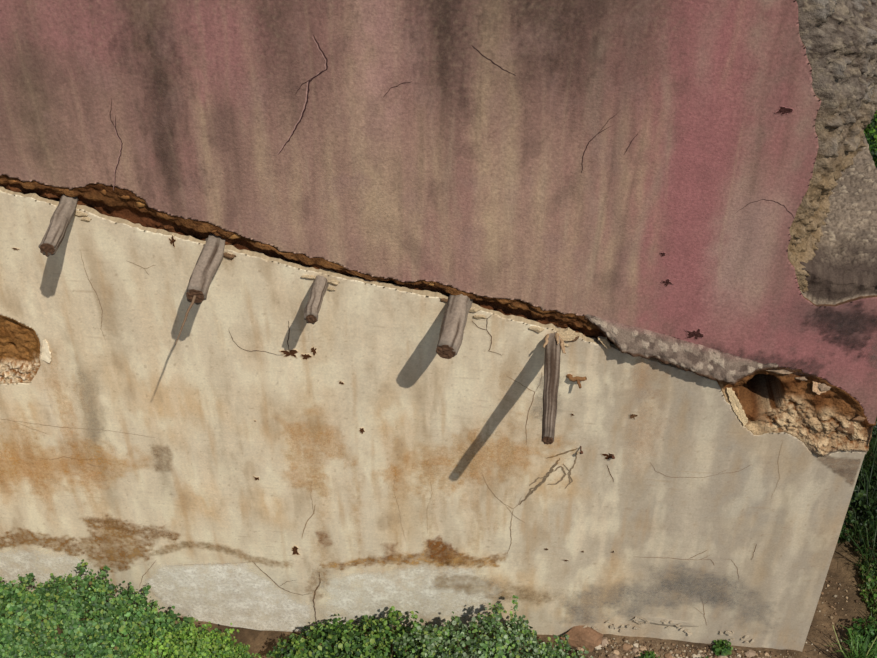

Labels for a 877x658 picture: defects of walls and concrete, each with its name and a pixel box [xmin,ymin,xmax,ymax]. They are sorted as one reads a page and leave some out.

crack [277,36,328,155]
flaking render [774,106,794,115]
spalling [0,315,52,384]
flaking render [557,327,579,341]
spalling [716,367,876,457]